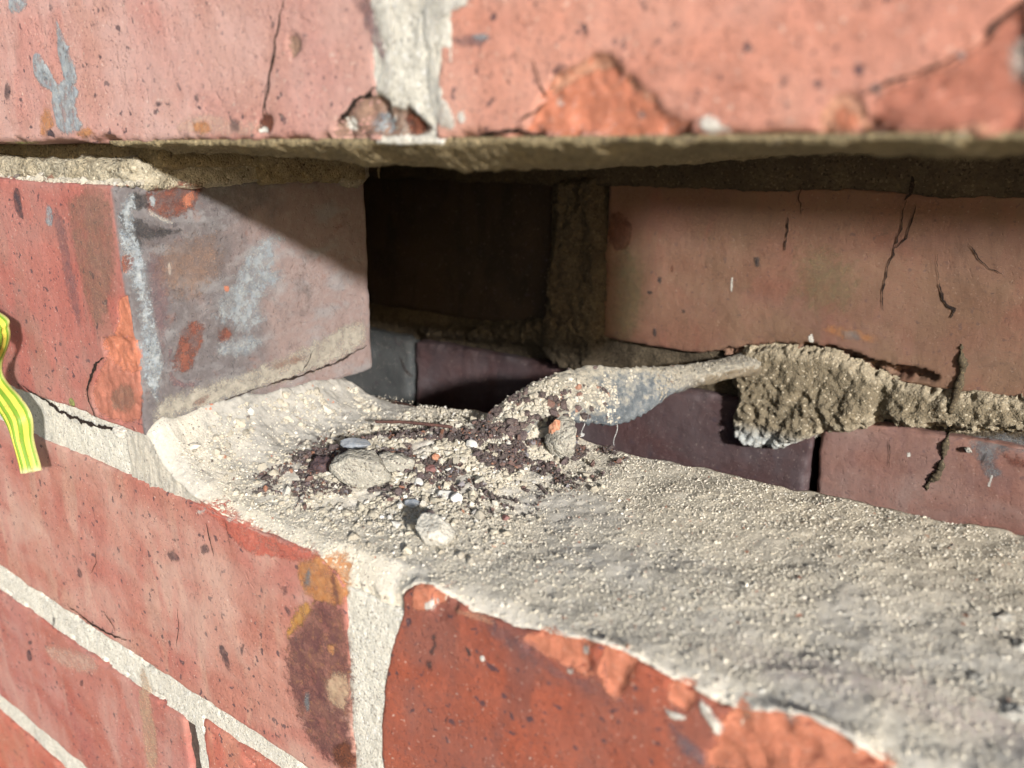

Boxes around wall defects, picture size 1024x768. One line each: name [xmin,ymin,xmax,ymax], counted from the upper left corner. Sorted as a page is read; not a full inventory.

damp [33,21,83,135]
crack [262,0,284,121]
spalling [335,95,432,137]
spalling [527,53,692,136]
crack [784,188,801,250]
crack [882,176,916,307]
damp [118,193,366,422]
crack [937,254,956,318]
crack [22,358,113,430]
spalling [94,296,145,423]
spalling [412,582,454,610]
spalling [523,626,638,701]